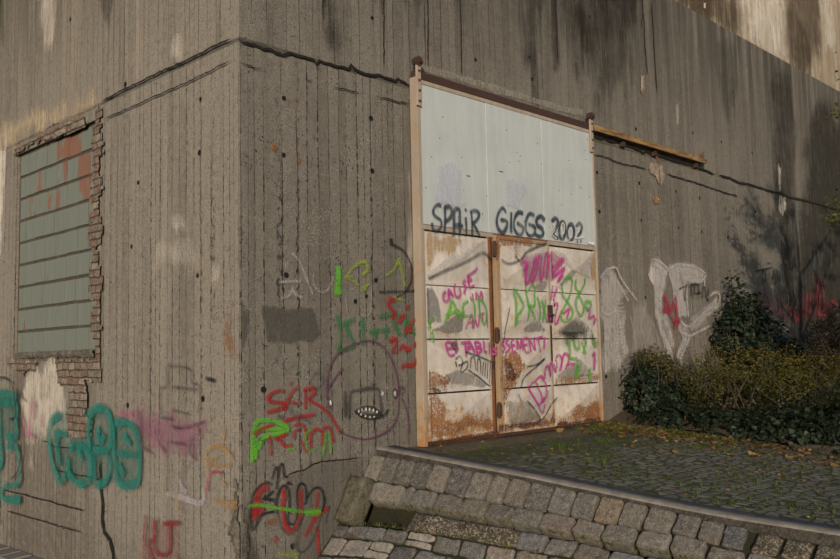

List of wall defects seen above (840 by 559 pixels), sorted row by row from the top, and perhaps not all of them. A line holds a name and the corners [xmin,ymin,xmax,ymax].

crack [102,0,409,118]
damp [687,0,836,71]
crack [593,136,837,210]
damp [772,74,840,370]
spalling [5,106,104,438]
rust [501,352,526,404]
rust [428,370,601,447]